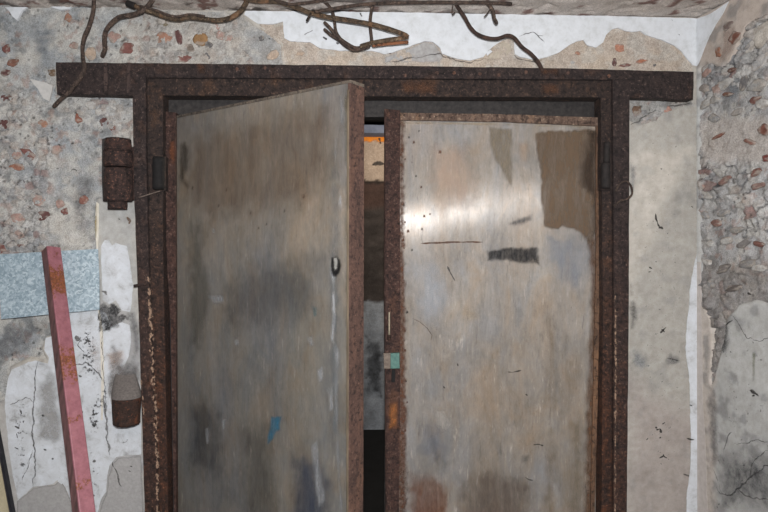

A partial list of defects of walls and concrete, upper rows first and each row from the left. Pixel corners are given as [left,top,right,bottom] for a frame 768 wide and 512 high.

crack [10,366,37,483]
peeling [0,308,72,512]
peeling [69,310,143,512]
spalling [0,1,729,312]
corrosion [390,121,445,512]
corrosion [585,239,595,512]
spalling [684,13,768,512]
crack [715,433,768,500]